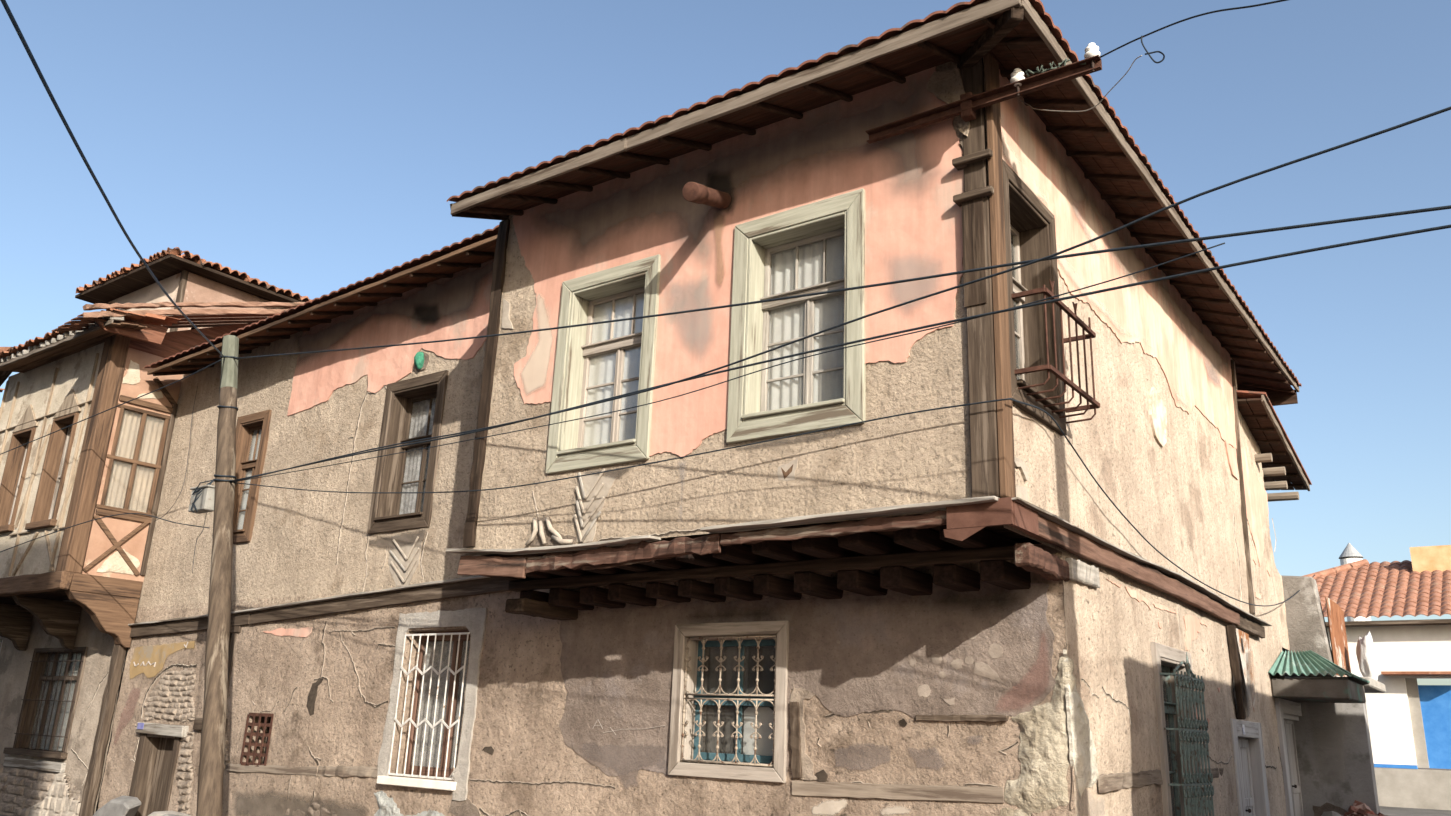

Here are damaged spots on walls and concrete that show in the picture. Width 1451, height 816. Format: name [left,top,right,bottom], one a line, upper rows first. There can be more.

flaking render [287,259,513,416]
flaking render [513,66,970,457]
flaking render [999,69,1270,576]
crack [336,375,428,592]
flaking render [144,668,196,815]
crack [285,621,396,712]
spalling [448,798,480,816]